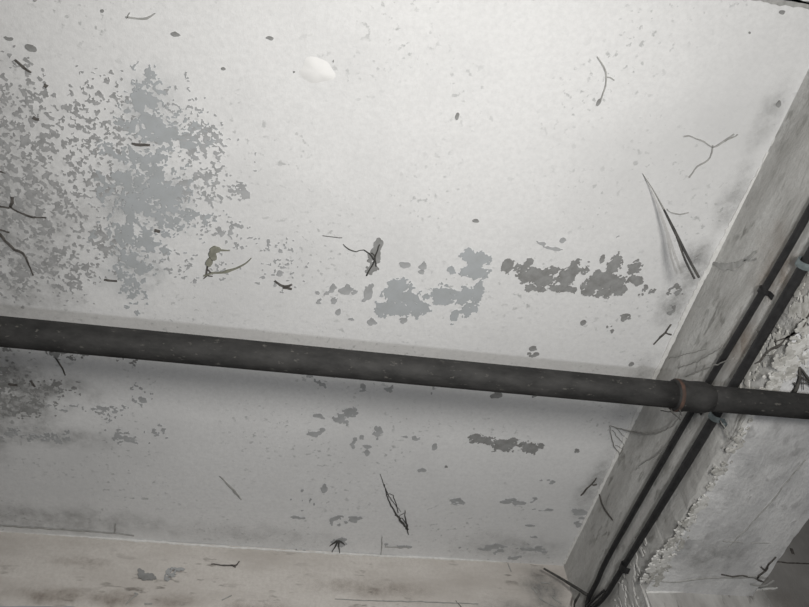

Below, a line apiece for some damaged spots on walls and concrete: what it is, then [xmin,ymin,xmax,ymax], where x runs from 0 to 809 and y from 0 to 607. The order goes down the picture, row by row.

peeling [316,237,657,326]
peeling [666,283,683,315]
peeling [307,407,358,437]
peeling [349,426,383,456]
peeling [467,433,545,455]